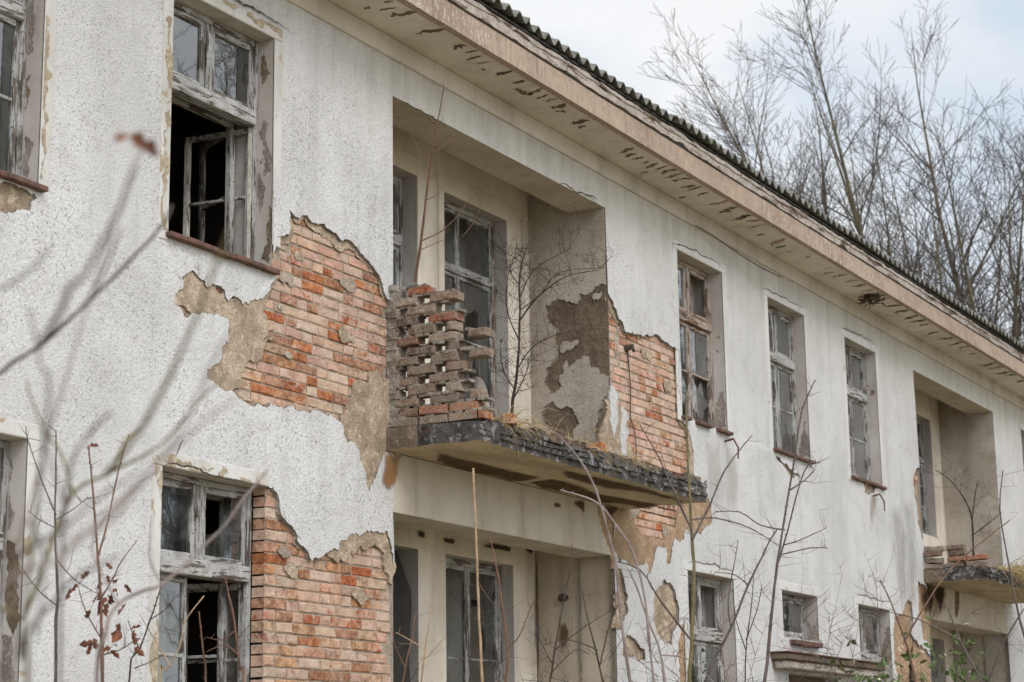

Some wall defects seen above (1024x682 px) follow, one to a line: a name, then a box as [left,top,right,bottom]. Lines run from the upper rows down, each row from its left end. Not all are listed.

peeling [0,0,52,214]
peeling [261,55,269,84]
peeling [157,453,223,500]
peeling [175,120,401,491]
peeling [541,283,707,483]
peeling [1,495,20,682]
peeling [240,477,396,682]
peeling [597,497,712,661]
peeling [653,579,686,682]
peeling [881,581,931,682]